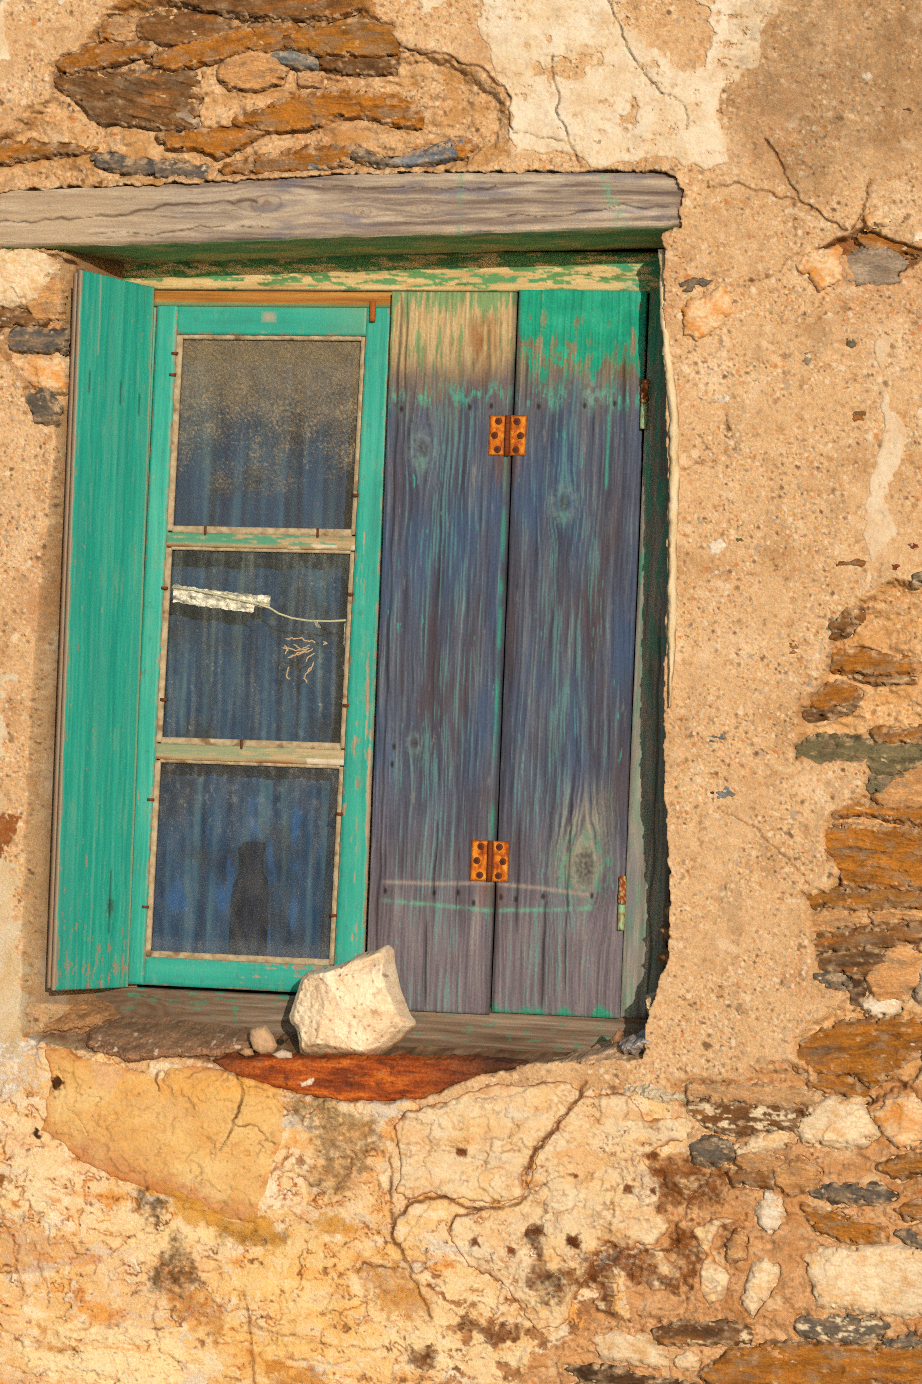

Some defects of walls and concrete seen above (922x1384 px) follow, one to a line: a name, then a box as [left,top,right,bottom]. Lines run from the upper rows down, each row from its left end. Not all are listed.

spalling [0,0,781,193]
crack [765,140,868,230]
spalling [816,210,922,287]
peeling [874,334,895,370]
spalling [394,392,922,1384]
crack [362,1085,584,1319]